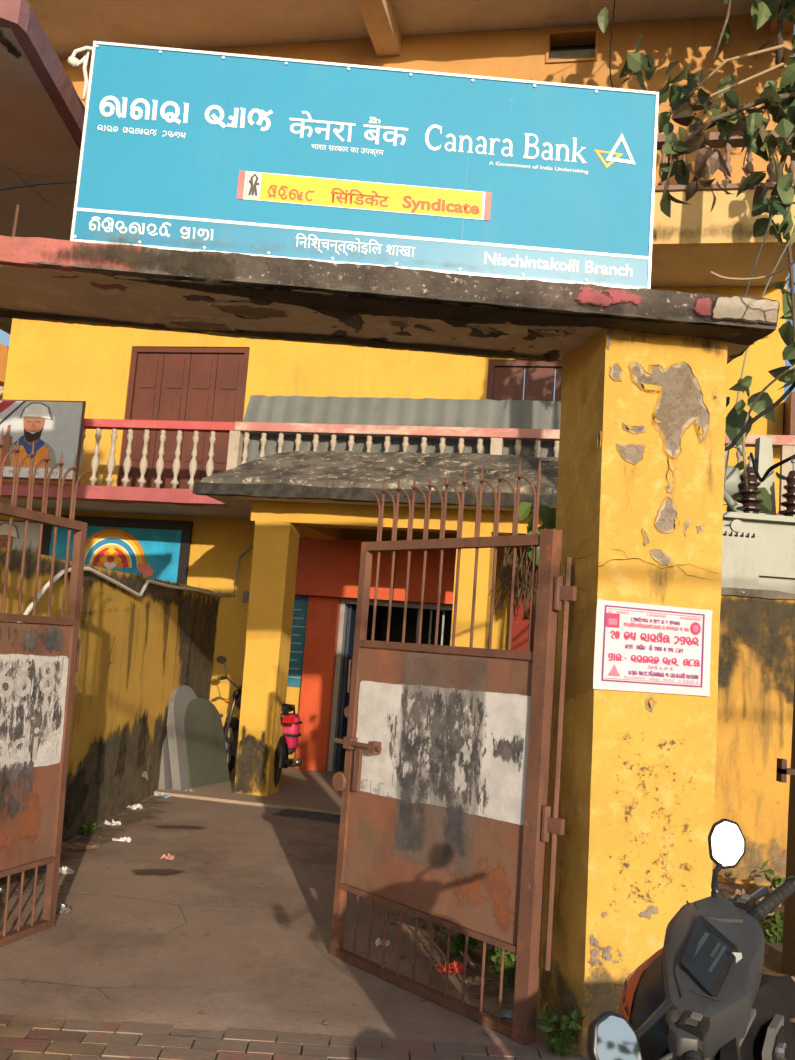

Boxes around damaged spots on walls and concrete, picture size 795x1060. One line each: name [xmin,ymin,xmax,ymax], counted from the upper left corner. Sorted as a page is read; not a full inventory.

leakage [57,241,235,283]
spalling [465,323,503,332]
spalling [527,325,577,338]
spalling [711,295,780,325]
peeling [609,359,711,466]
peeling [641,483,703,566]
crack [564,541,718,593]
leakage [718,595,795,724]
leakage [60,706,201,863]
leakage [233,726,270,794]
leakage [0,865,47,894]
peeling [589,934,623,967]